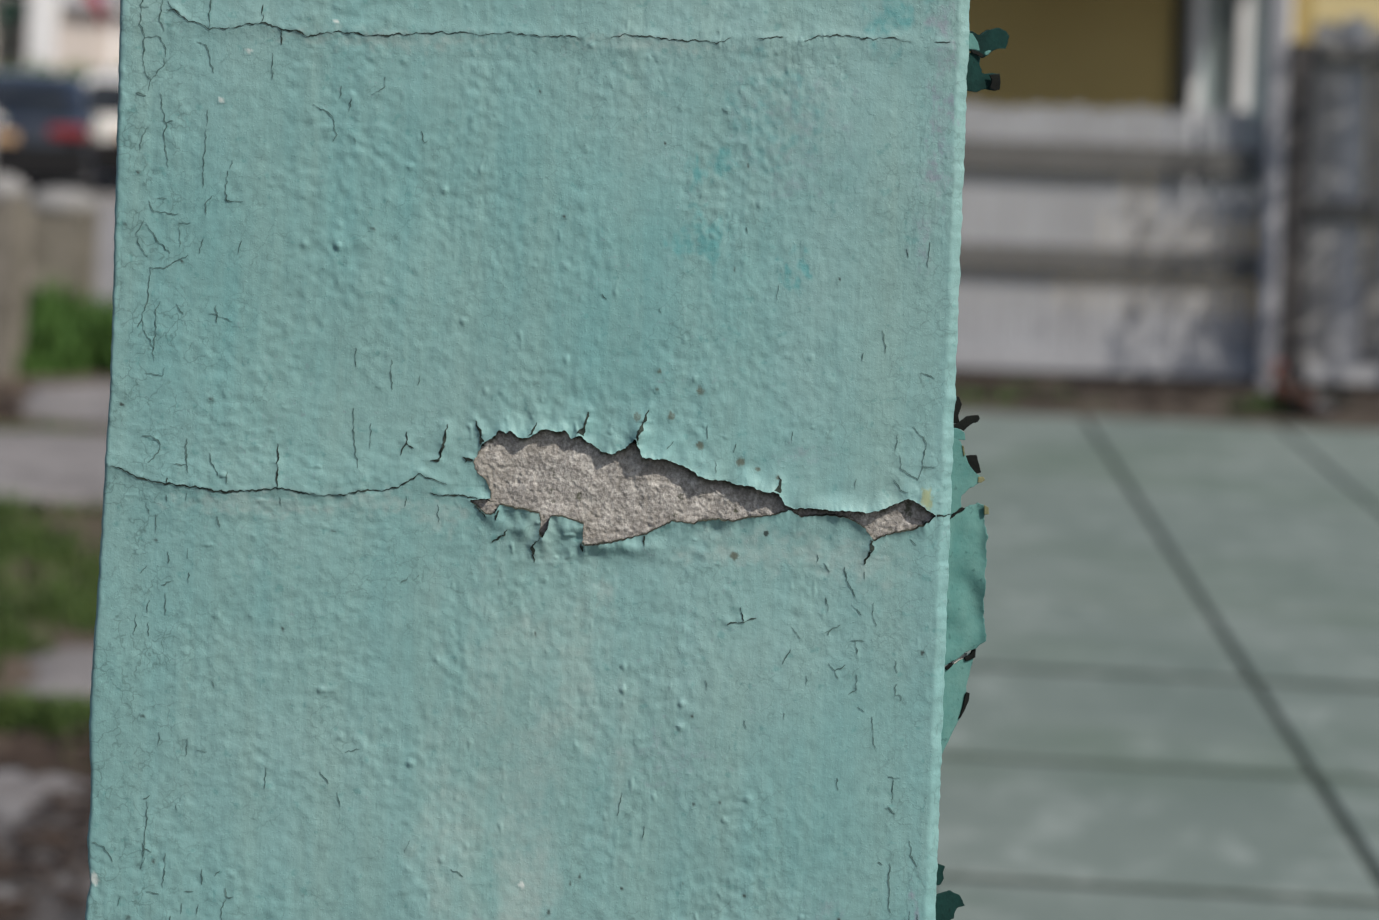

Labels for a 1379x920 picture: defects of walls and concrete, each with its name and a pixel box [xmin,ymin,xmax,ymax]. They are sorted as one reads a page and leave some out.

peeling [966,28,1009,92]
crack [136,0,948,376]
crack [113,408,496,636]
peeling [462,396,989,753]
peeling [935,864,965,920]